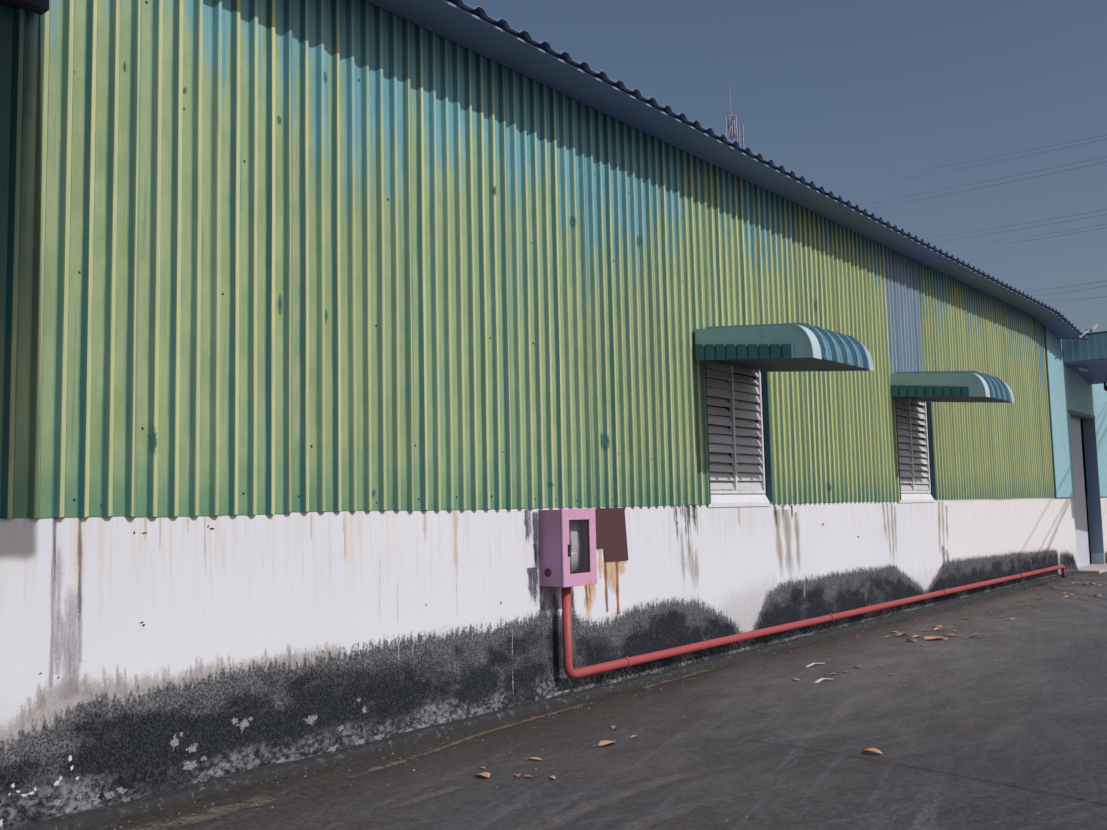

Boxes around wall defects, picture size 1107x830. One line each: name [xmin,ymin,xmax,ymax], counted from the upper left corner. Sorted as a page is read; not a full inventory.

water stain [0,501,1078,830]
corrosion [585,548,626,614]